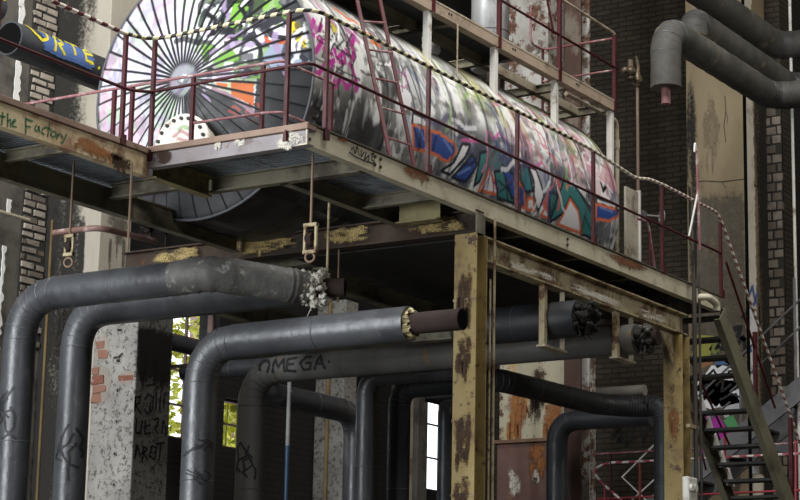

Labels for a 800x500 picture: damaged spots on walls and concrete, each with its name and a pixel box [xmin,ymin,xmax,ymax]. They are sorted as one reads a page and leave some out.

rust [75,137,131,177]
rust [455,272,472,382]
rust [453,414,471,500]
peeling [508,470,521,497]
rust [507,395,562,479]